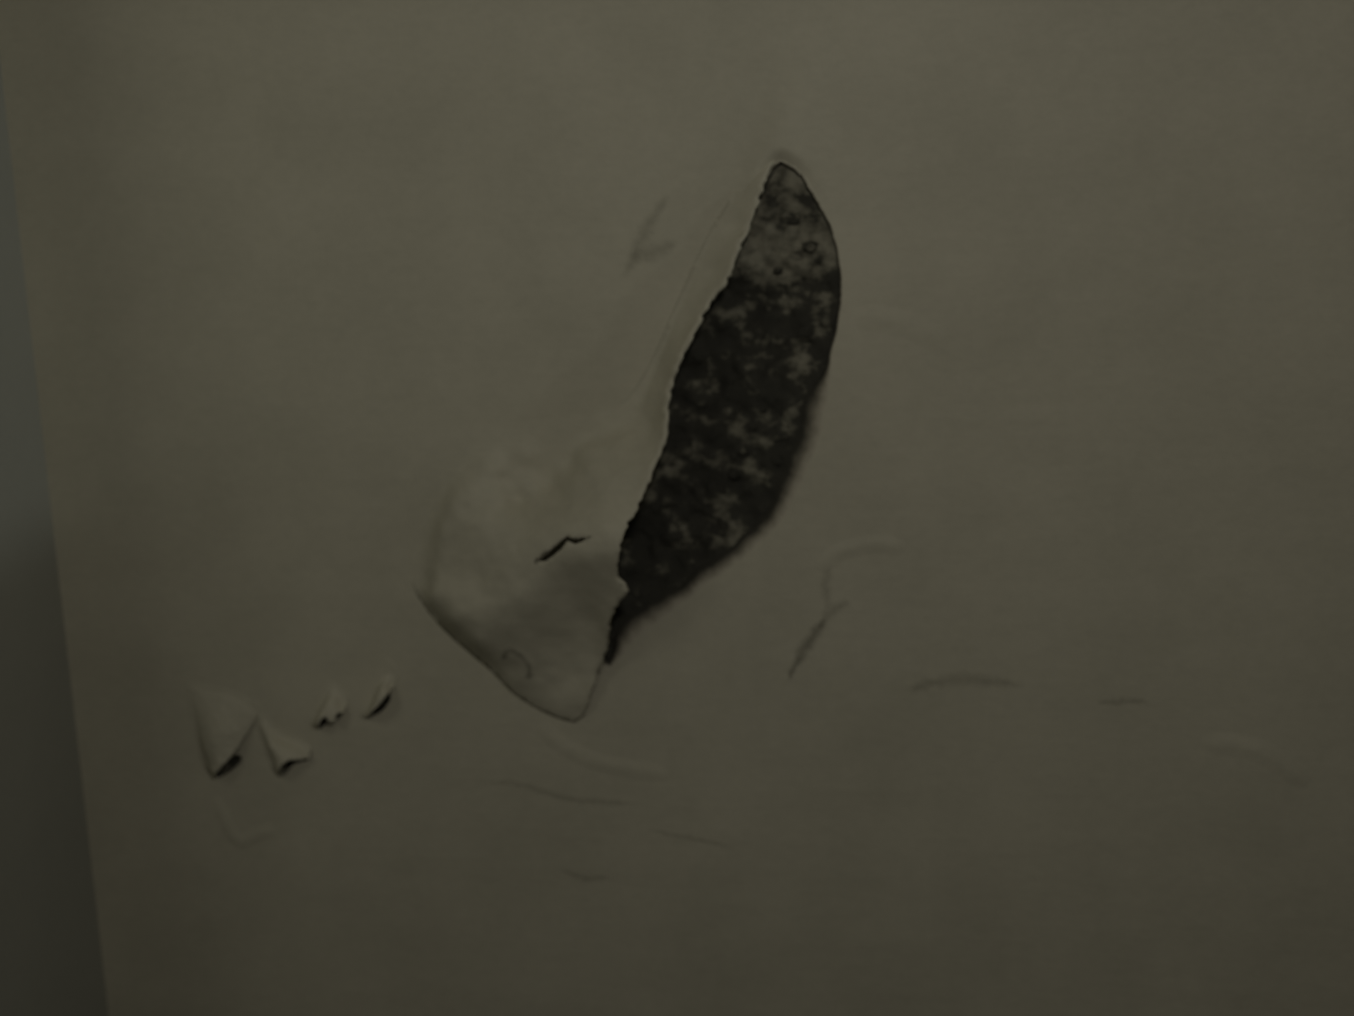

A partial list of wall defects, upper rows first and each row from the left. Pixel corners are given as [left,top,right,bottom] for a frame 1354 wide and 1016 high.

peeling [409,160,842,723]